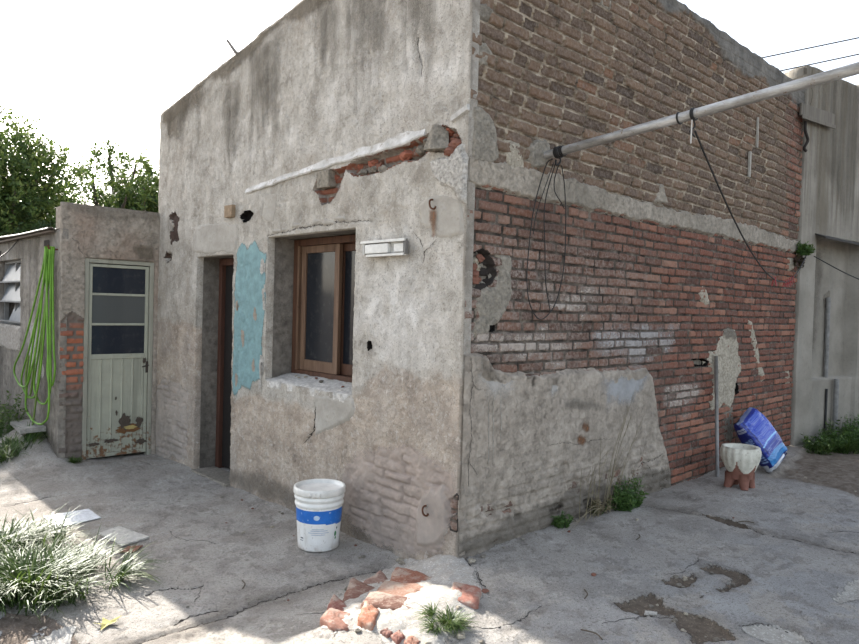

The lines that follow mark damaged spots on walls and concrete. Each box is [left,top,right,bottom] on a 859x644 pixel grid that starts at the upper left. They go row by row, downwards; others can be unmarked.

leakage [163,0,326,135]
spalling [313,124,462,205]
spalling [164,212,179,263]
spalling [472,248,497,290]
crack [468,362,483,485]